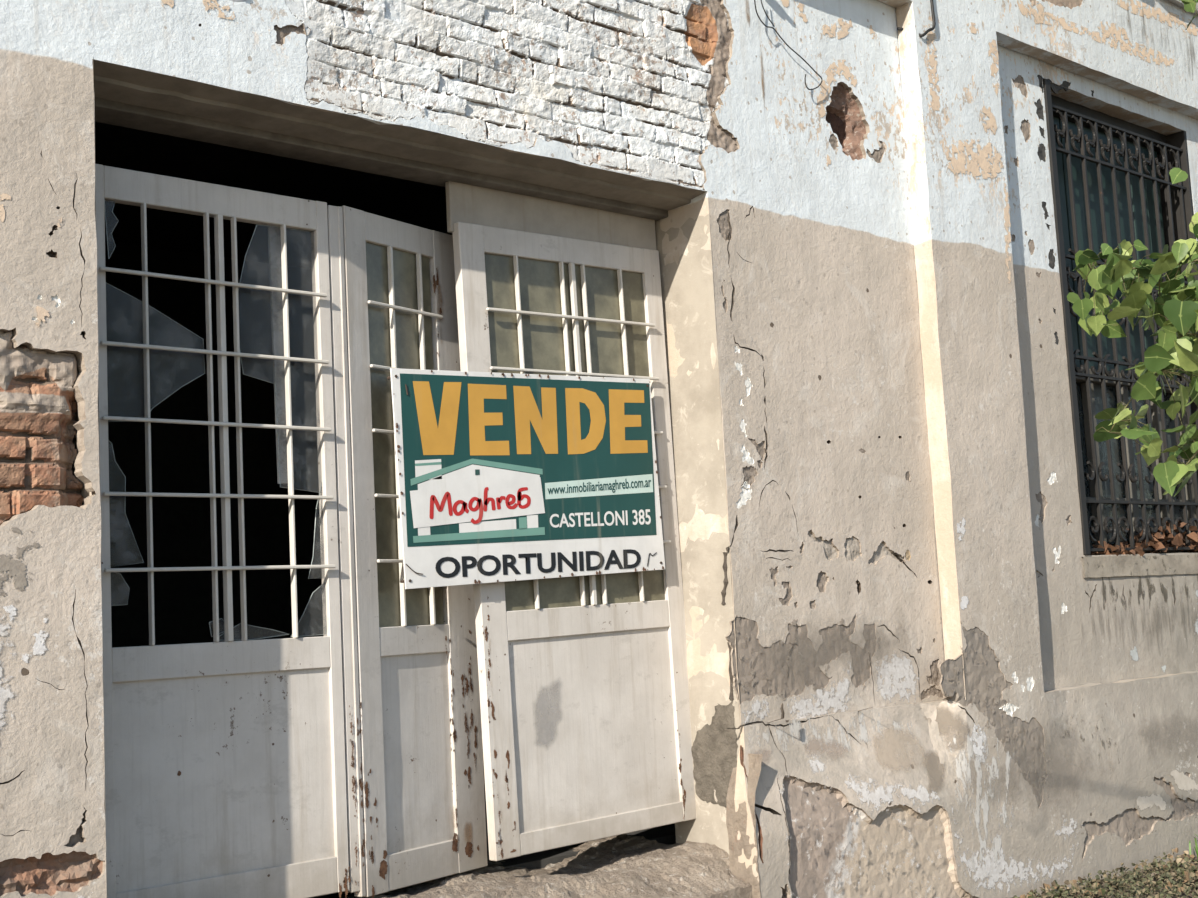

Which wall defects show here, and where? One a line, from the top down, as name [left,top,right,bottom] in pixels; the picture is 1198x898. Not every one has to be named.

flaking render [274,0,740,190]
flaking render [0,327,94,596]
flaking render [0,808,105,897]
crack [37,589,89,791]
corrosion [339,702,388,898]
corrosion [445,622,496,857]
corrosion [492,749,516,858]
peeling [691,530,911,808]
crack [726,624,920,874]
flaking render [778,775,978,898]
peeling [917,621,1051,809]
leakage [1102,576,1188,610]